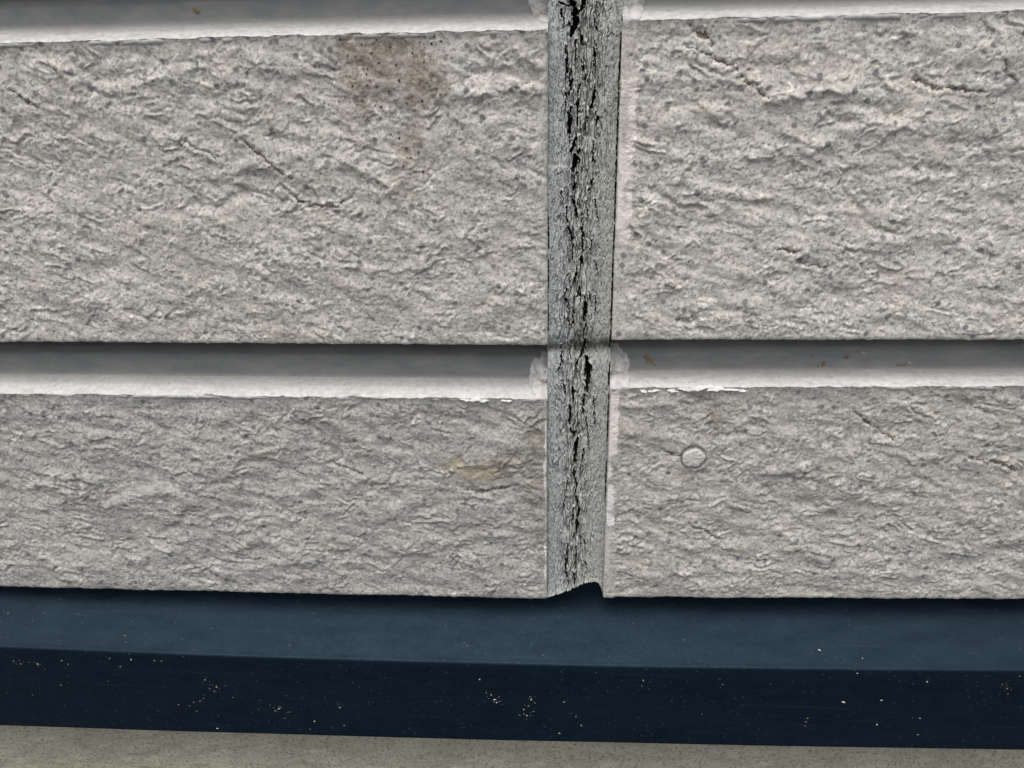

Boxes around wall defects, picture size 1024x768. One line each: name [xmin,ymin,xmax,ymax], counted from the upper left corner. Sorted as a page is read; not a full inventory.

crack [548,0,621,586]